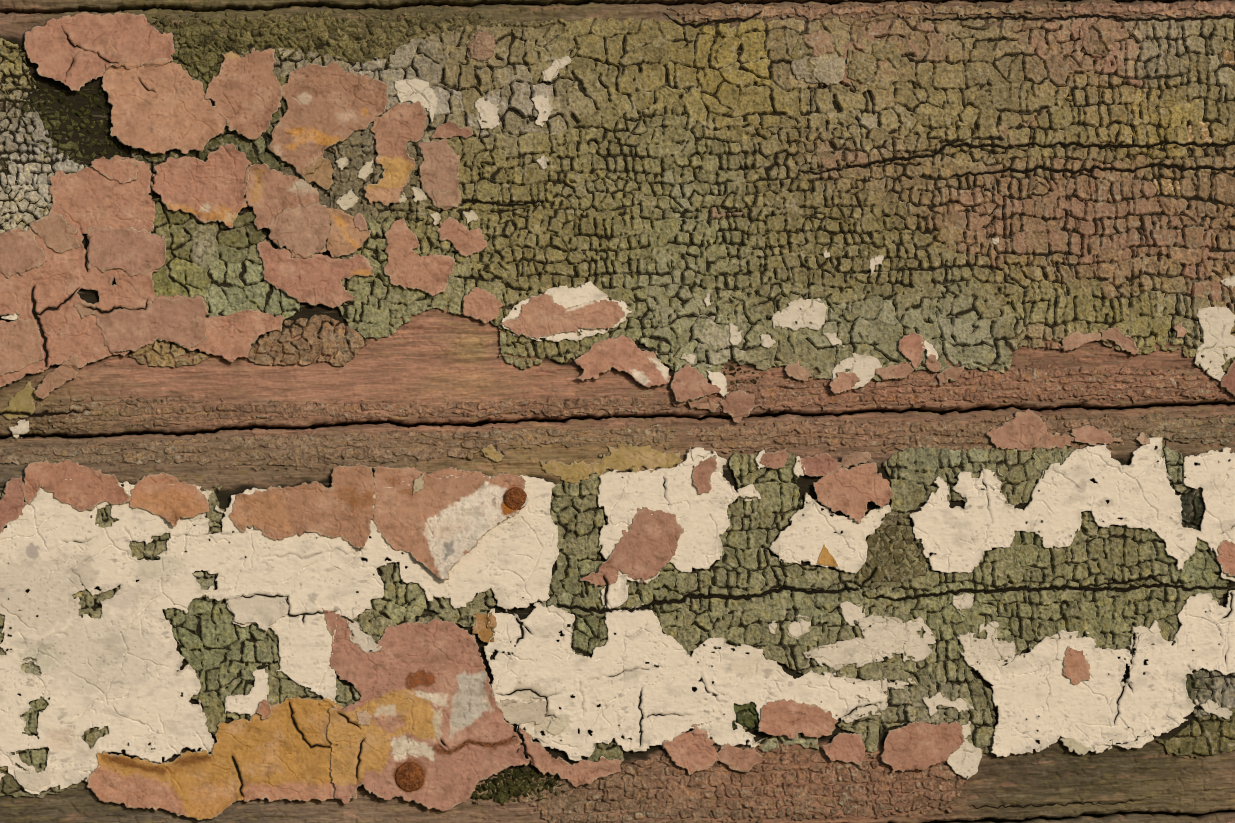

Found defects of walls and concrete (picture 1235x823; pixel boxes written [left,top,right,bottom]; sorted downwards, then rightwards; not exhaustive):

crack [663,11,762,28]
crack [923,14,1235,22]
peeling [531,56,571,127]
crack [800,141,1235,178]
peeling [0,12,500,439]
peeling [1059,327,1140,355]
peeling [1173,306,1235,397]
peeling [0,441,936,821]
crack [557,567,1233,625]
peeling [880,409,1235,780]
crack [1114,637,1135,723]
crack [286,696,330,748]